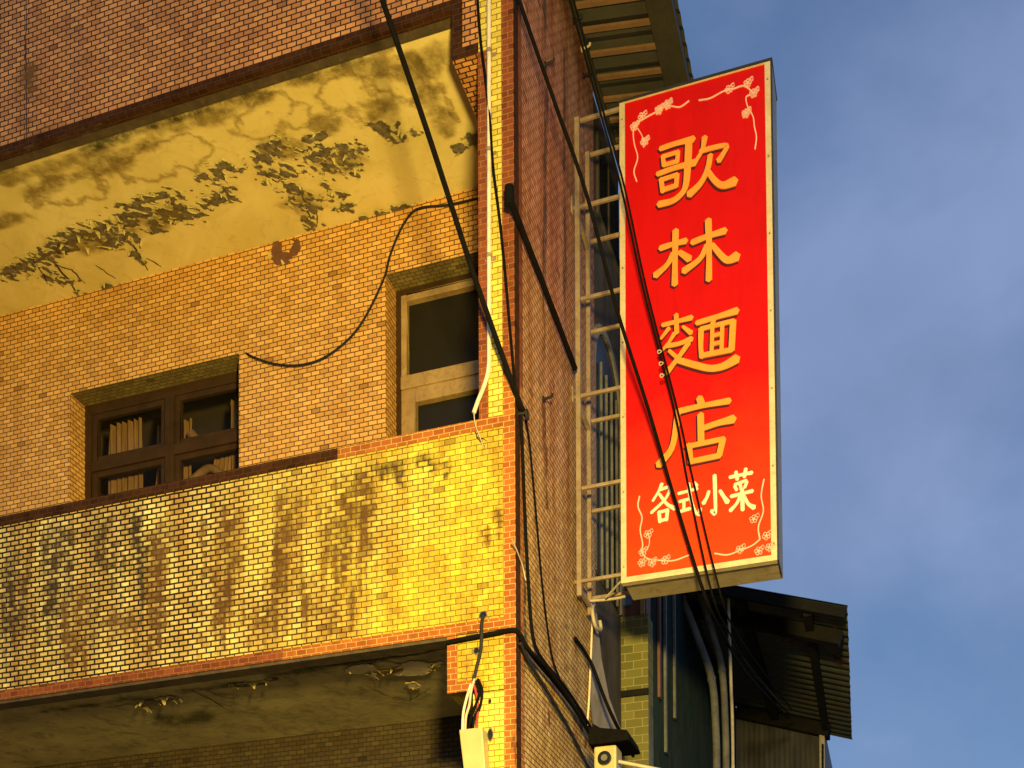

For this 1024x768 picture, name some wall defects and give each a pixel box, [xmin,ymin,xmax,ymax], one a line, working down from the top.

leakage [0,90,272,192]
peeling [364,120,425,146]
leakage [0,214,20,229]
peeling [0,131,416,296]
leakage [0,527,89,667]
leakage [95,516,169,656]
leakage [213,493,302,645]
leakage [301,465,402,635]
spalling [135,696,182,713]
flaking render [345,661,446,690]